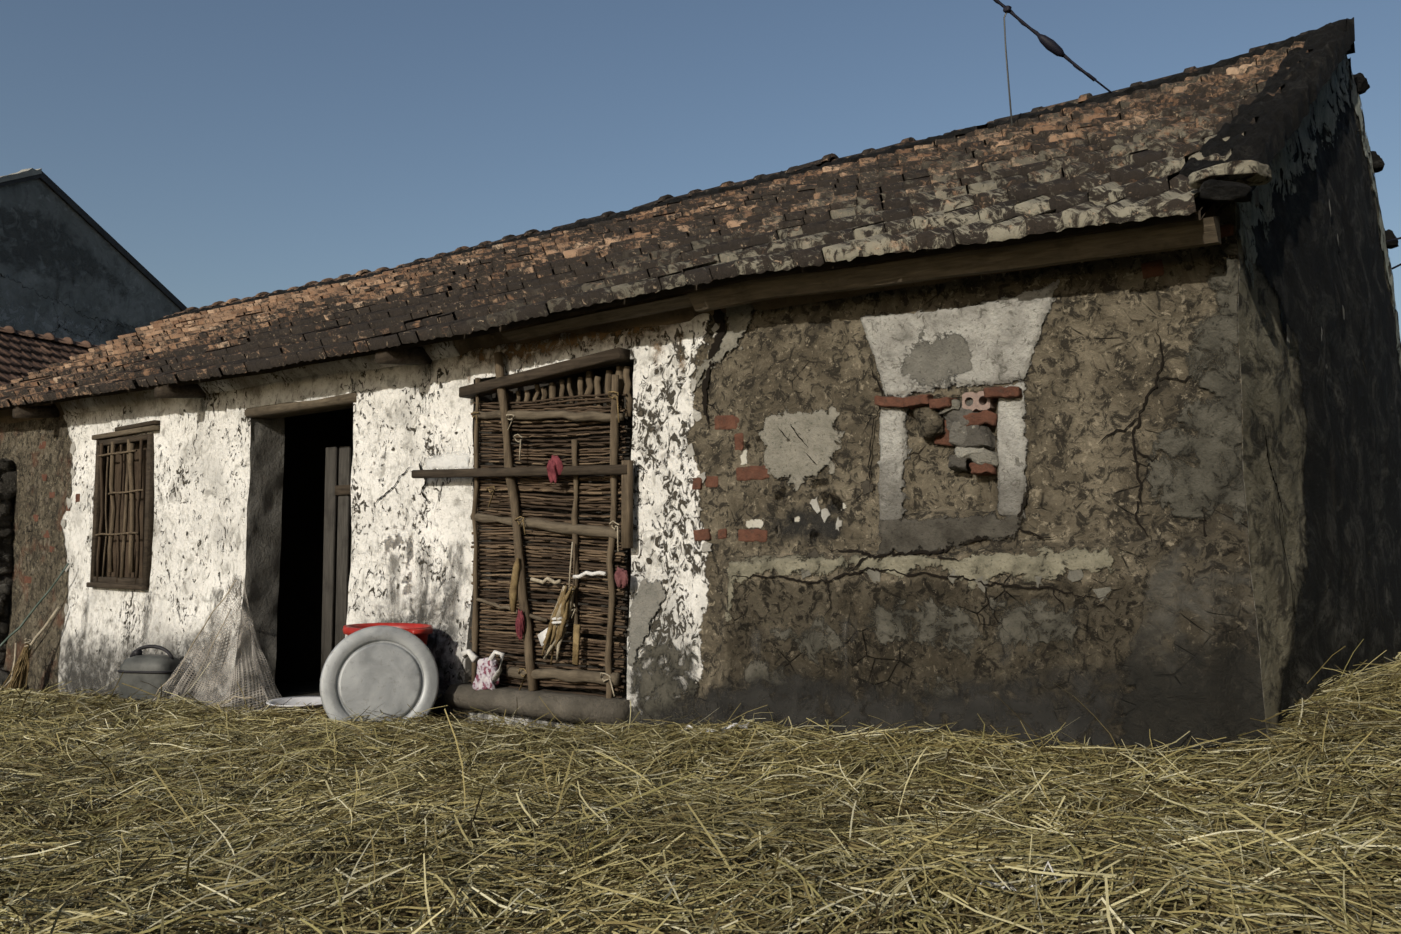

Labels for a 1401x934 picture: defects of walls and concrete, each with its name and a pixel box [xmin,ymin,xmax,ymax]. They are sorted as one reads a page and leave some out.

crack [725,470,1116,631]
spalling [675,58,1401,746]